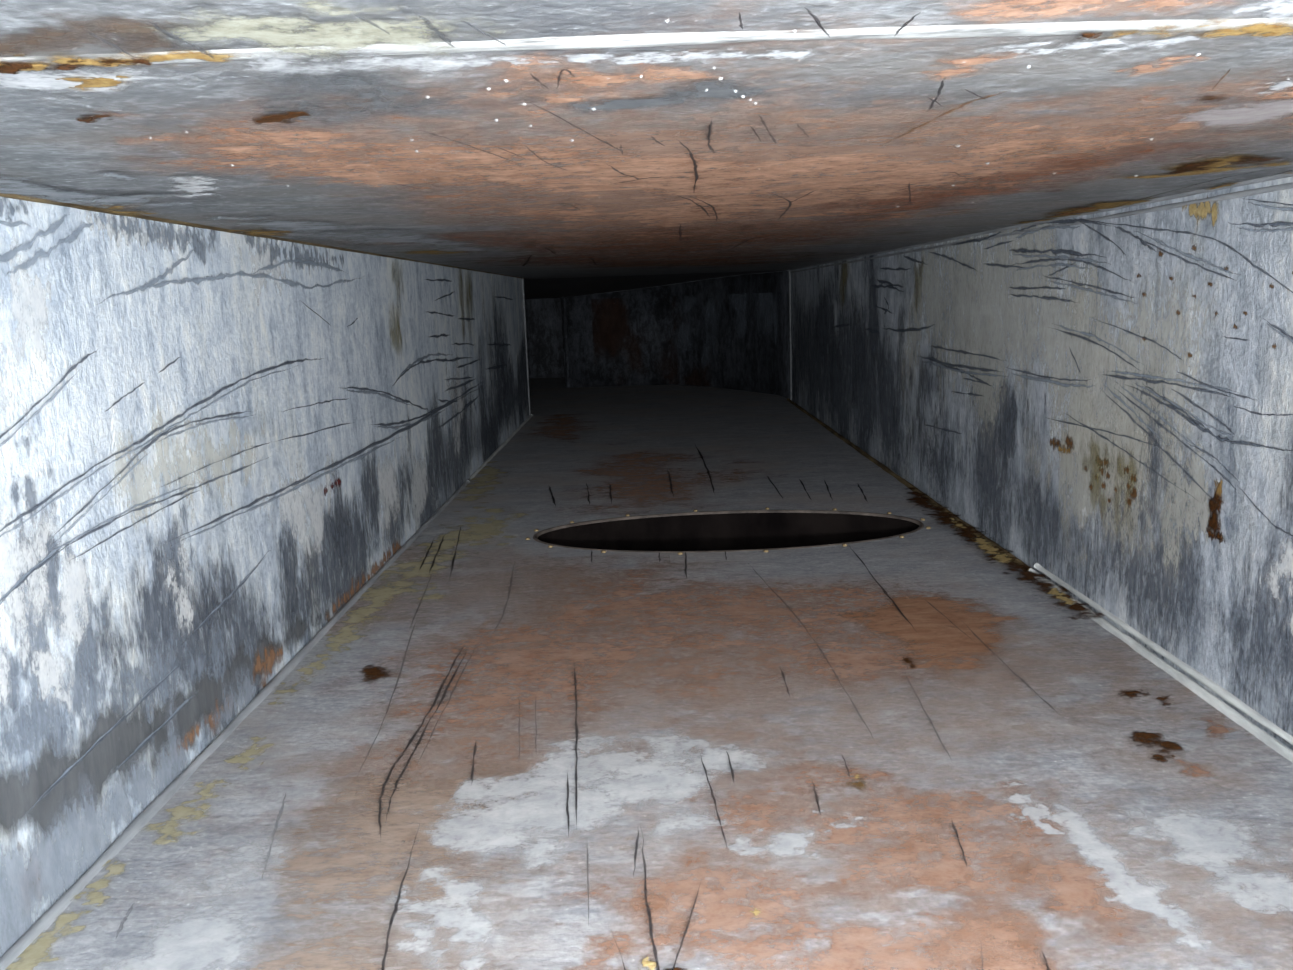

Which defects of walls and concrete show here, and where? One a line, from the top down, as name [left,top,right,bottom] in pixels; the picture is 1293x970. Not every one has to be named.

corrosion [1199,21,1293,38]
corrosion [145,56,1293,304]
water stain [0,300,529,970]
water stain [674,255,1206,660]
corrosion [1206,480,1225,544]
water stain [1219,469,1293,749]
water stain [432,733,768,867]
corrosion [251,567,1019,970]
corrosion [577,763,1127,970]
water stain [1008,782,1211,948]
corrosion [1130,732,1211,777]
water stain [1129,809,1293,914]